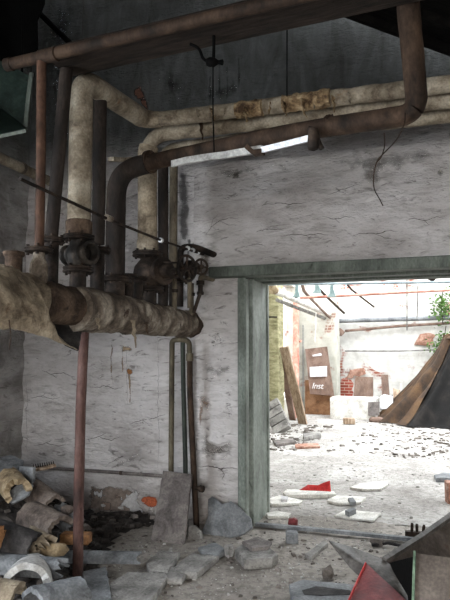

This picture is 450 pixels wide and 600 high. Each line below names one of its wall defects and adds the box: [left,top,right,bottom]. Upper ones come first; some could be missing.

water stain [179,173,190,244]
crack [352,216,441,239]
peeling [90,486,157,514]